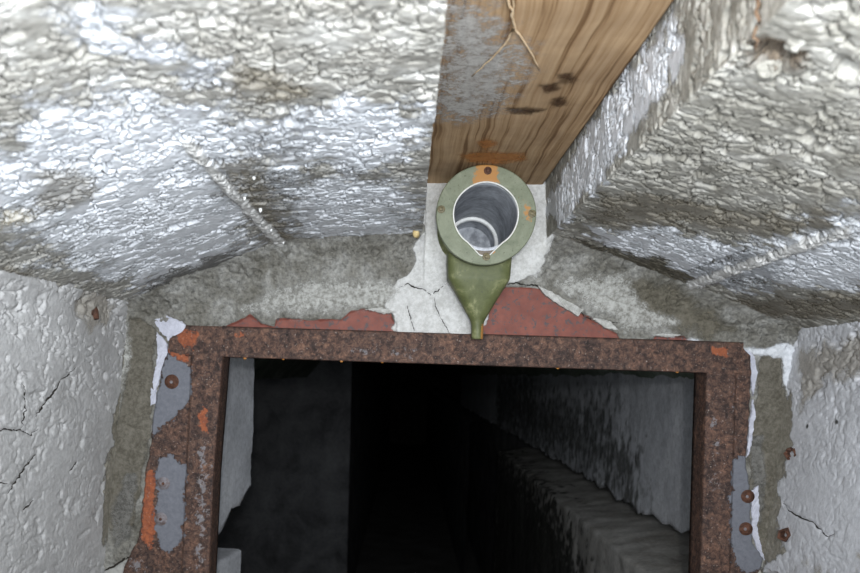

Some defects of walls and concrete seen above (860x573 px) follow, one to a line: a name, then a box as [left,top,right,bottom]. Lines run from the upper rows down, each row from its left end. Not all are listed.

peeling [150,315,186,405]
flaking render [227,307,395,331]
crack [402,283,449,333]
flaking render [483,285,619,338]
flaking render [651,332,688,340]
crack [0,368,75,493]
crack [783,503,835,537]